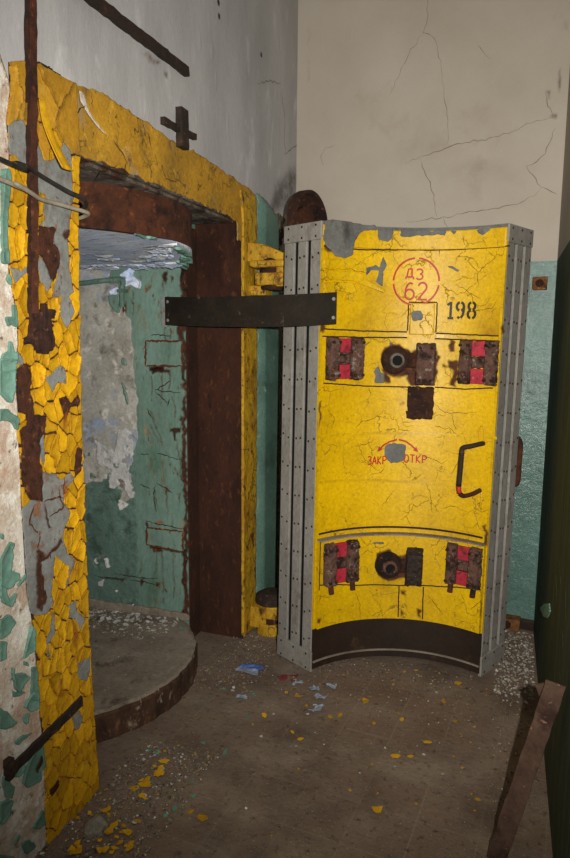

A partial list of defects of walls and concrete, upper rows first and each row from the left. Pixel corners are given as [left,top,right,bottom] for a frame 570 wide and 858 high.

corrosion [38,227,70,280]
corrosion [163,268,187,297]
crack [390,5,556,315]
corrosion [17,364,82,611]
peeling [0,61,193,844]
corrosion [144,326,190,615]
peeling [0,835,36,858]